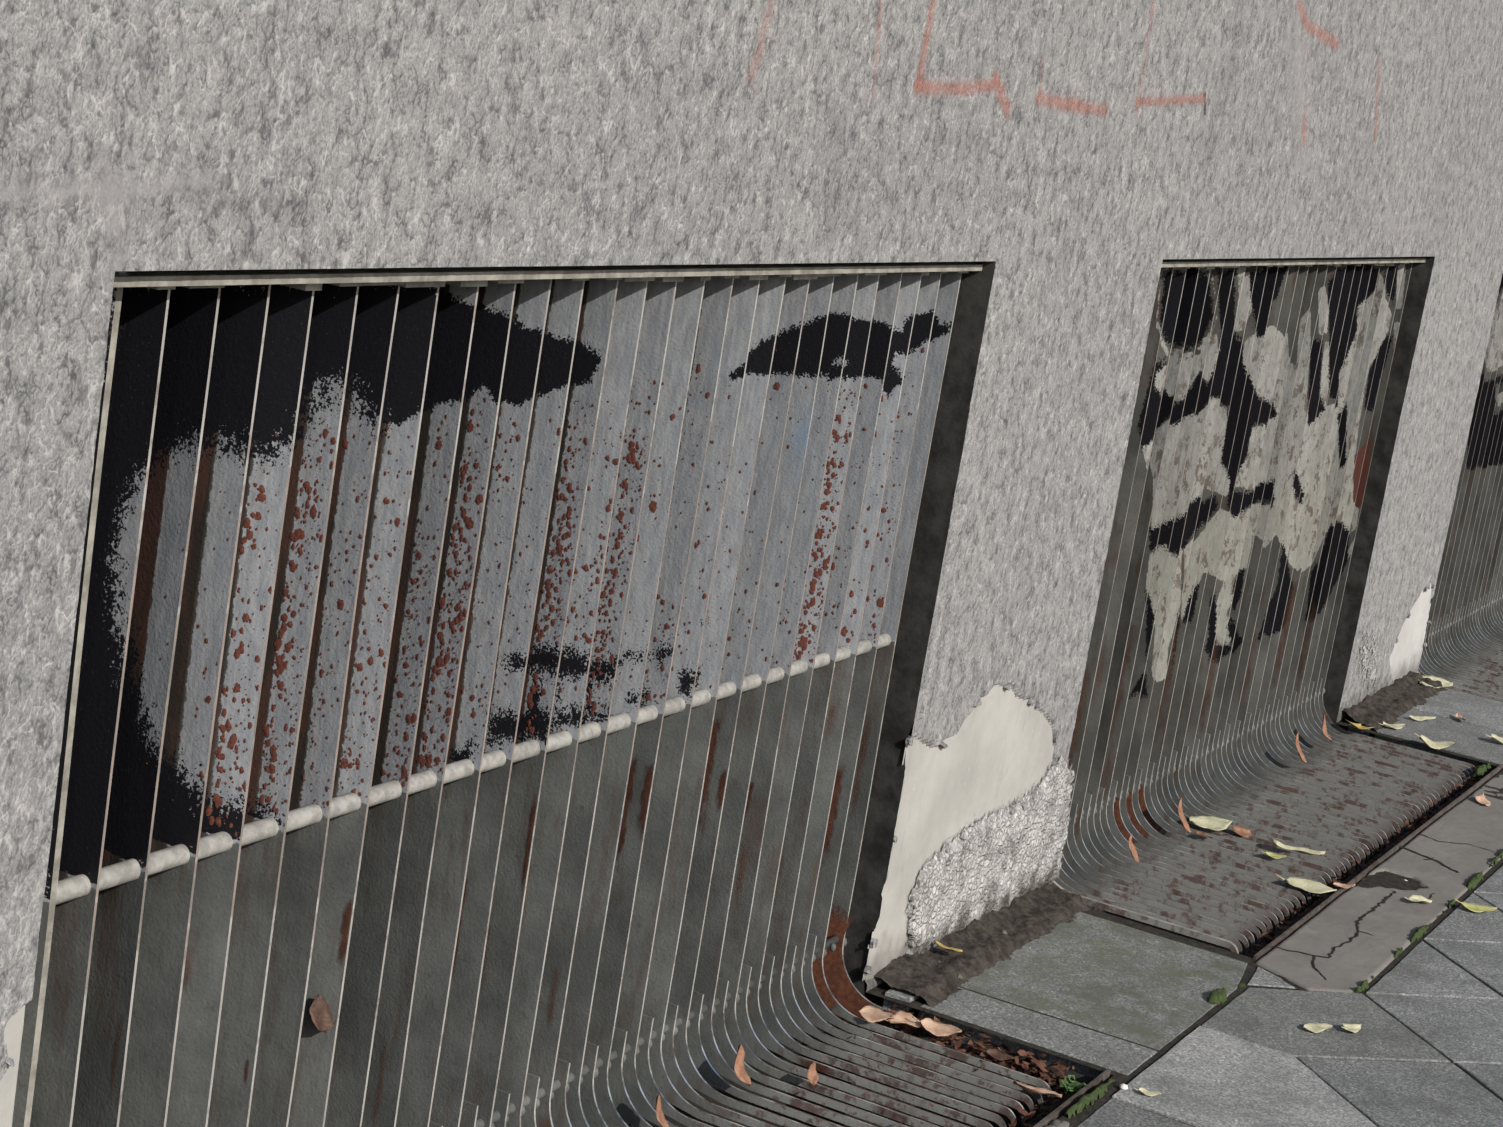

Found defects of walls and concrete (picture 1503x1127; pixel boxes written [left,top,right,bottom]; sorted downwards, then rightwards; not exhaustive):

rust [195,353,914,837]
spalling [1390,583,1435,681]
spalling [862,684,1058,983]
rust [1114,786,1161,844]
rust [812,908,872,1027]
crack [1272,834,1500,989]
spalling [0,1005,25,1127]
rust [805,1061,843,1092]